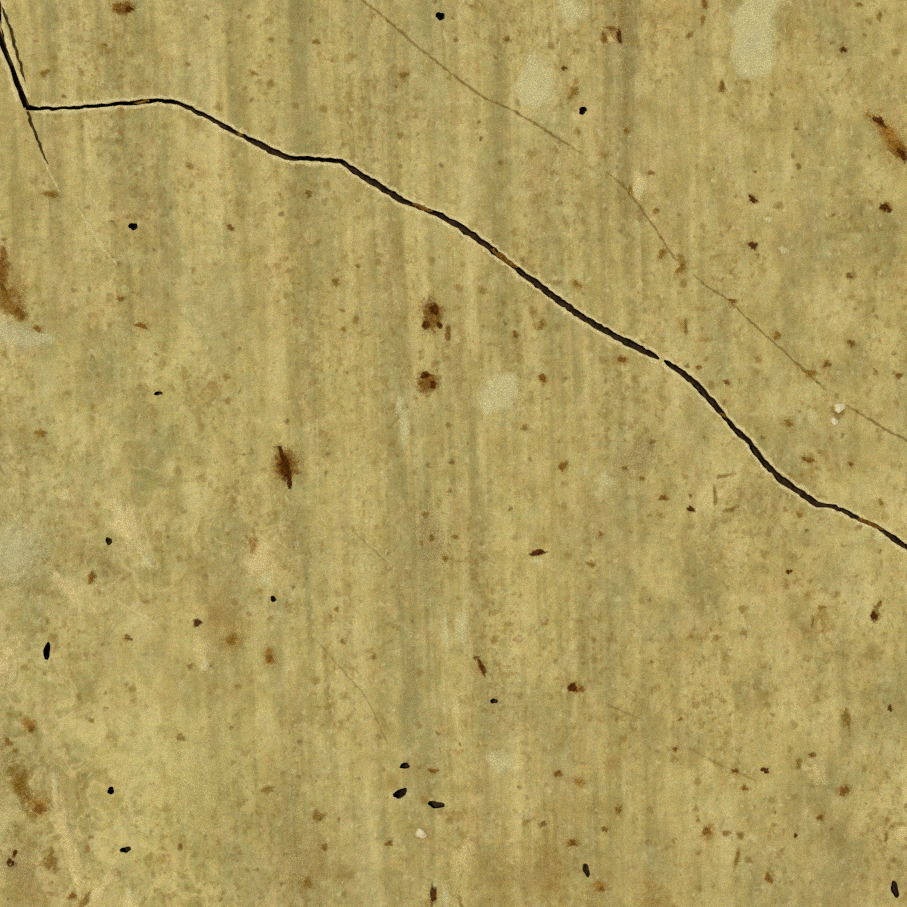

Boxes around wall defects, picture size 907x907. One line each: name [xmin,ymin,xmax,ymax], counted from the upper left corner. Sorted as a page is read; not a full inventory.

corrosion [867,114,907,160]
corrosion [0,238,27,321]
crack [0,0,907,552]
corrosion [422,298,450,340]
corrosion [417,371,437,396]
corrosion [273,446,299,489]